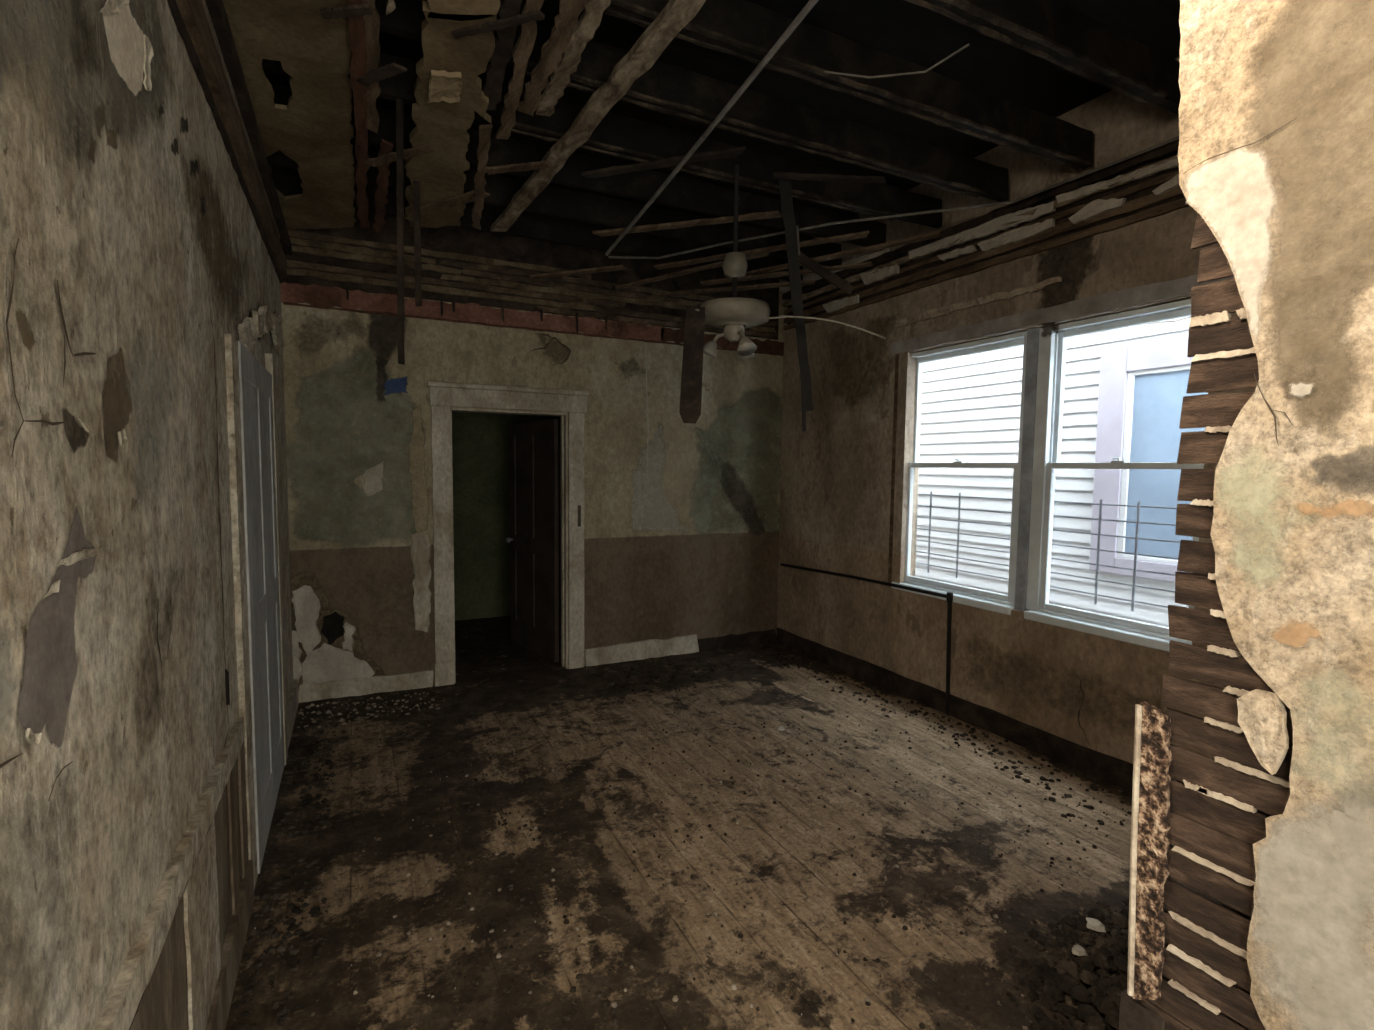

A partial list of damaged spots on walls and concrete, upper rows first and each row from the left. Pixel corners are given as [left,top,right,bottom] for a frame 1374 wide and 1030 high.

flaking render [100,0,154,96]
crack [6,238,64,458]
crack [57,280,96,388]
flaking render [63,349,133,462]
spalling [1291,383,1312,397]
leakage [1298,447,1374,518]
flaking render [19,507,103,747]
spalling [280,139,1293,1030]